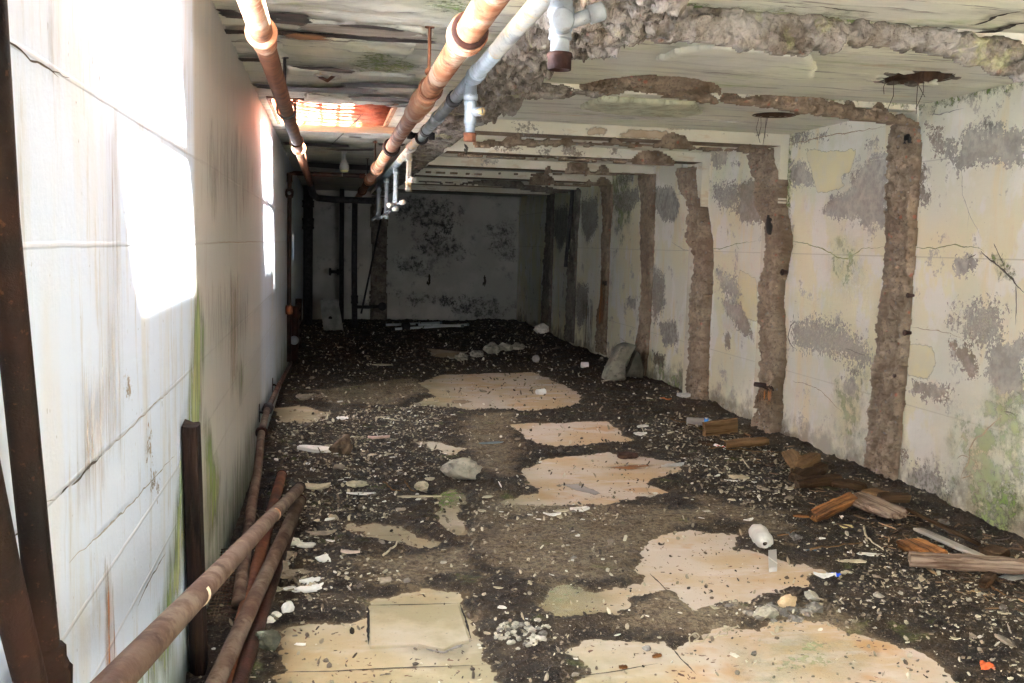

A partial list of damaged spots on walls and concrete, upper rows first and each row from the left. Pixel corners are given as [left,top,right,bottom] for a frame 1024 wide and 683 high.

crack [10,42,69,78]
spalling [583,4,1024,87]
damp [396,196,465,277]
crack [792,241,880,260]
spalling [419,89,1024,500]
crack [47,393,168,502]
crack [69,457,173,563]